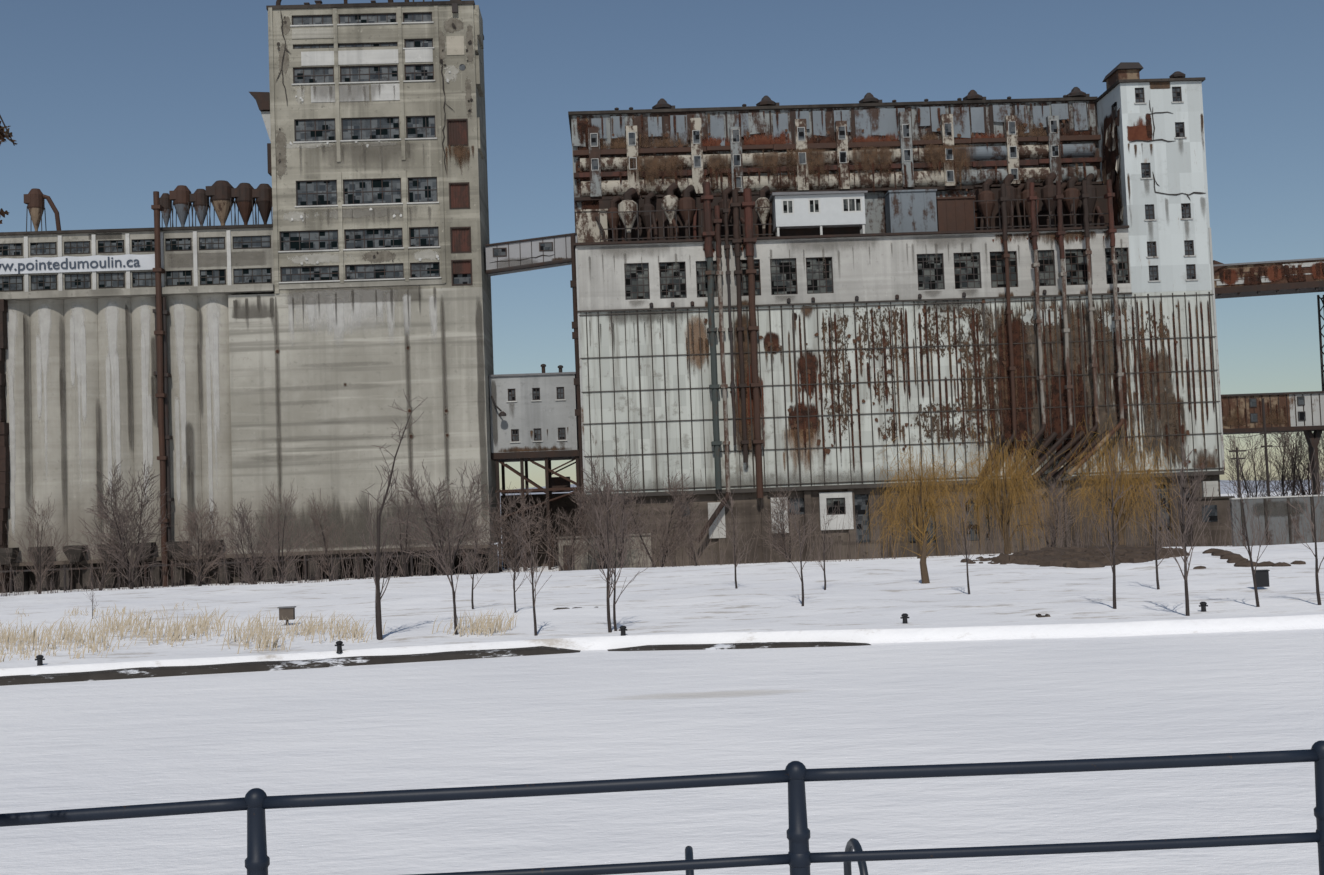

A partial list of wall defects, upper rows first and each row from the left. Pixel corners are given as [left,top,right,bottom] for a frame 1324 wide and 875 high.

corrosion [576,103,1153,240]
crack [1131,100,1177,142]
crack [1153,174,1205,199]
leakage [7,303,157,530]
leakage [174,288,437,535]
corrosion [686,302,709,369]
corrosion [730,289,1287,484]